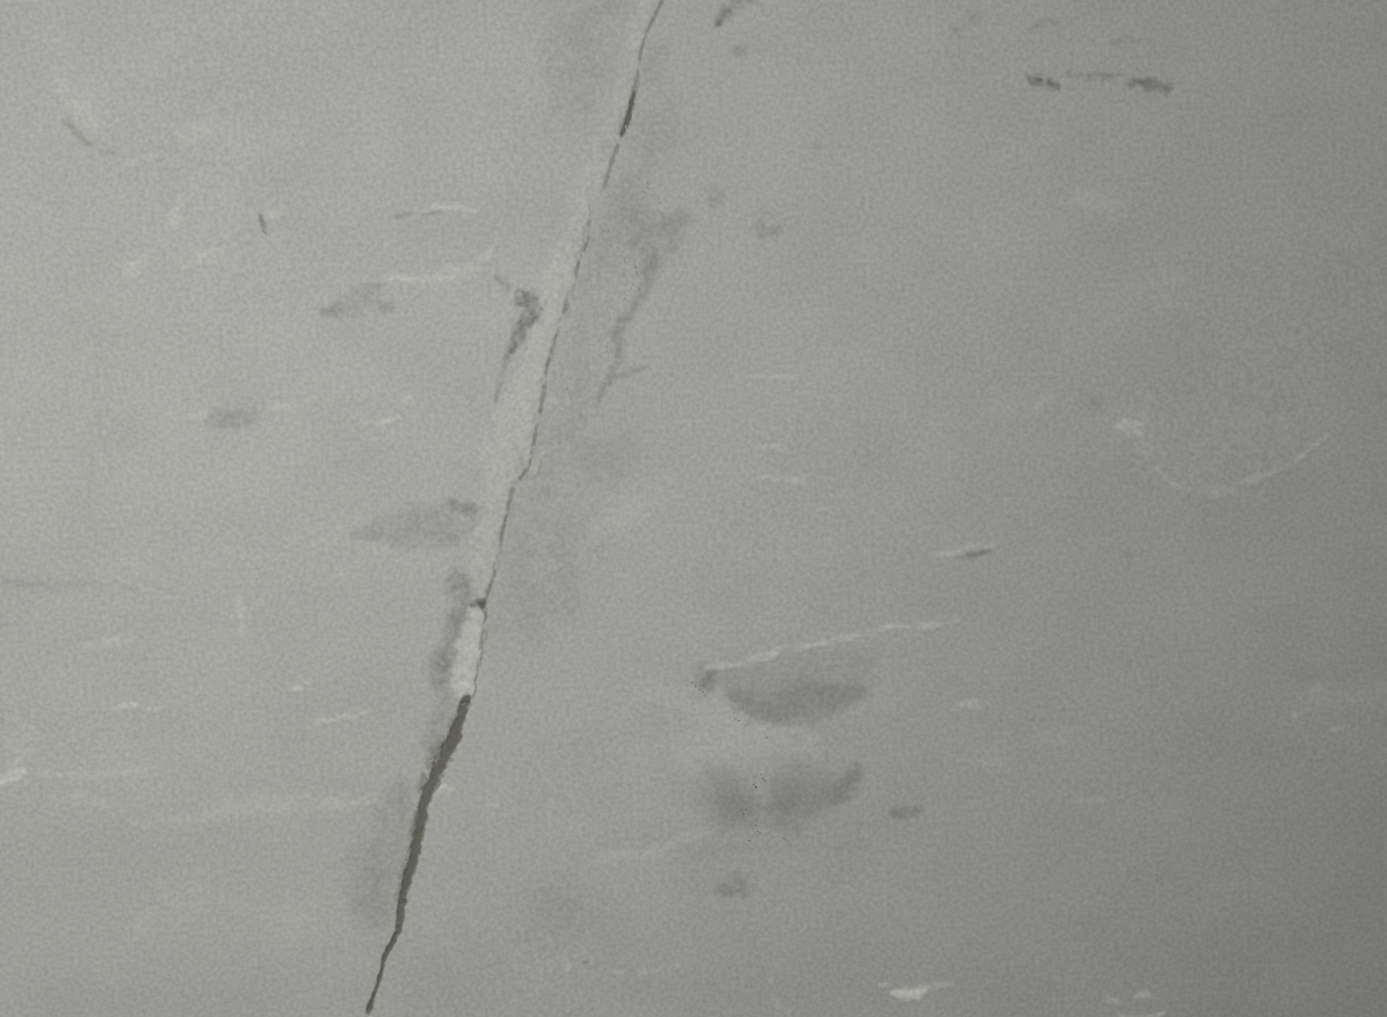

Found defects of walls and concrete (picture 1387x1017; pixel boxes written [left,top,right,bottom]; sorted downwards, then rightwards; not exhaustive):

crack [365,0,667,1016]
water stain [686,746,870,848]